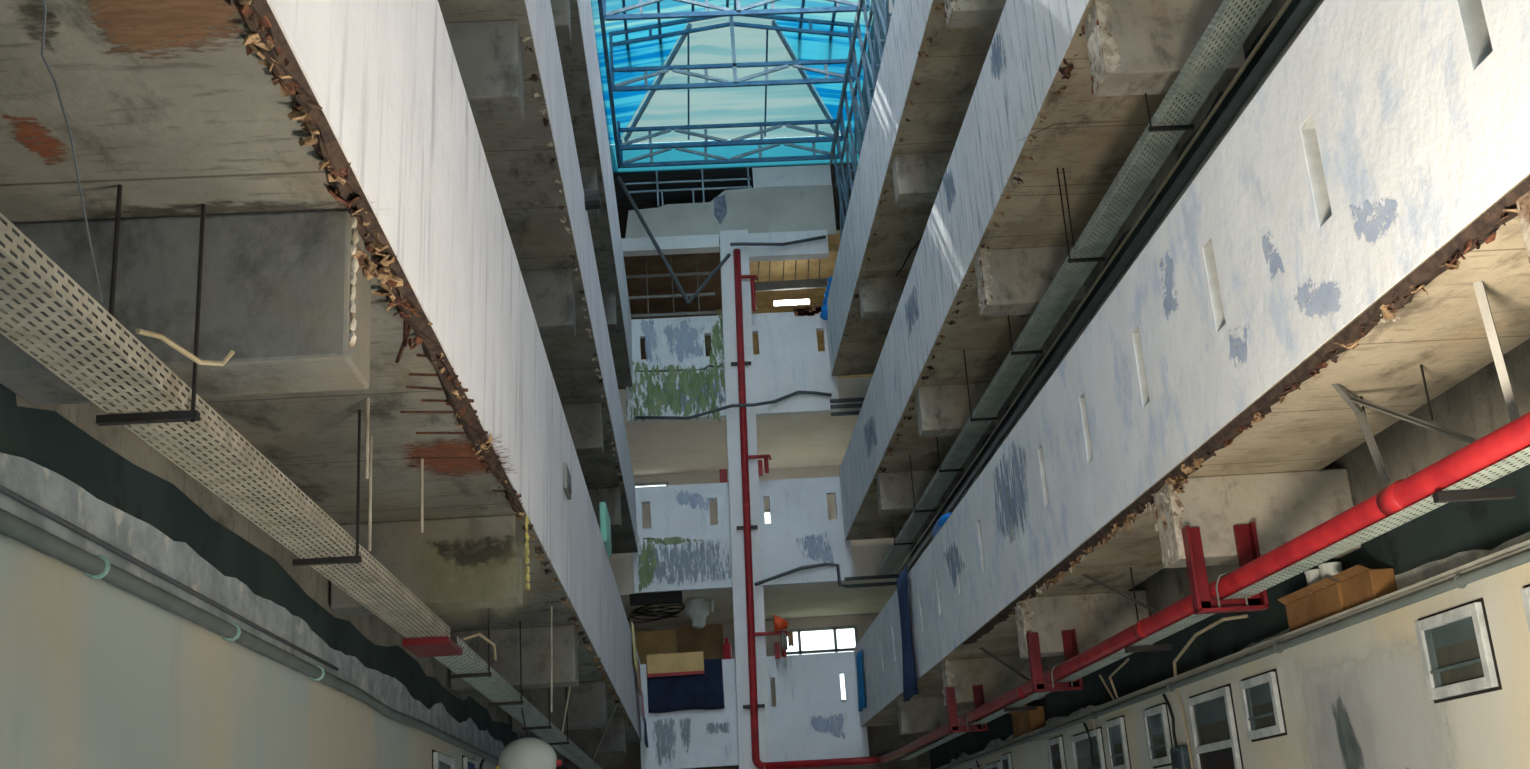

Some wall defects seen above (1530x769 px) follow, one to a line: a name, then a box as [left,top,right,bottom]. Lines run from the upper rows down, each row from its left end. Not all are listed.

rust [82,0,250,59]
rust [4,115,65,165]
peeling [943,168,956,212]
spalling [224,0,632,727]
spalling [962,176,1530,658]
rust [400,437,513,477]
damp [642,541,731,585]
peeling [945,543,965,588]
damp [1333,701,1363,769]